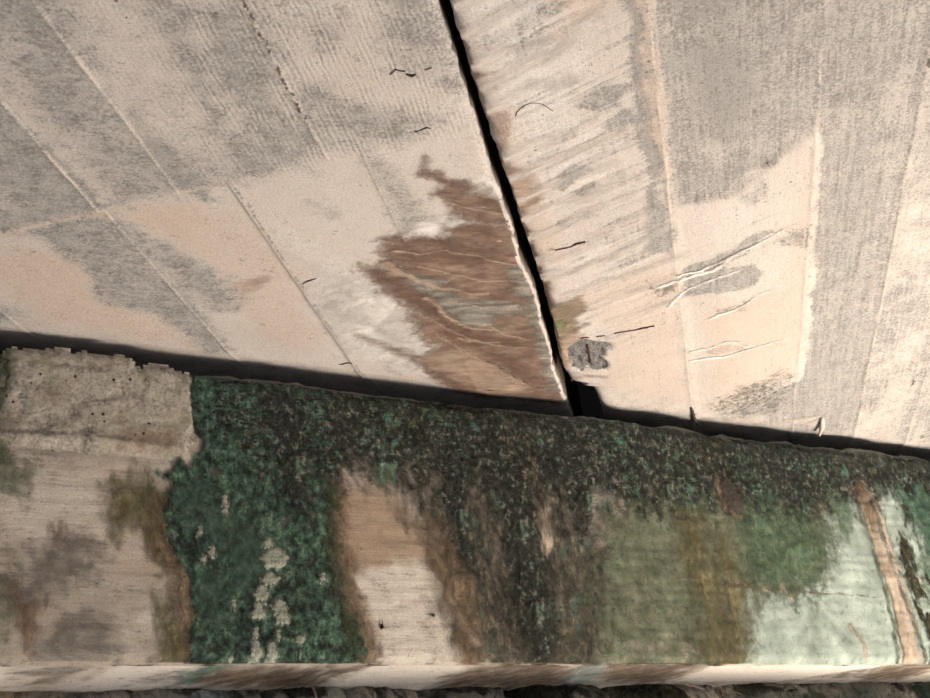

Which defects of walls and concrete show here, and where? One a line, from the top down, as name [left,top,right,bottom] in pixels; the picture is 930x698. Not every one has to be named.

leakage [509,164,551,183]
leakage [521,203,574,223]
leakage [311,169,566,405]
leakage [551,285,606,336]
leakage [658,230,784,308]
spalling [566,339,613,371]
leakage [711,374,792,418]
leakage [0,444,34,496]
leakage [399,417,616,690]
leakage [602,502,756,685]
leakage [195,666,364,690]
leakage [867,665,930,681]